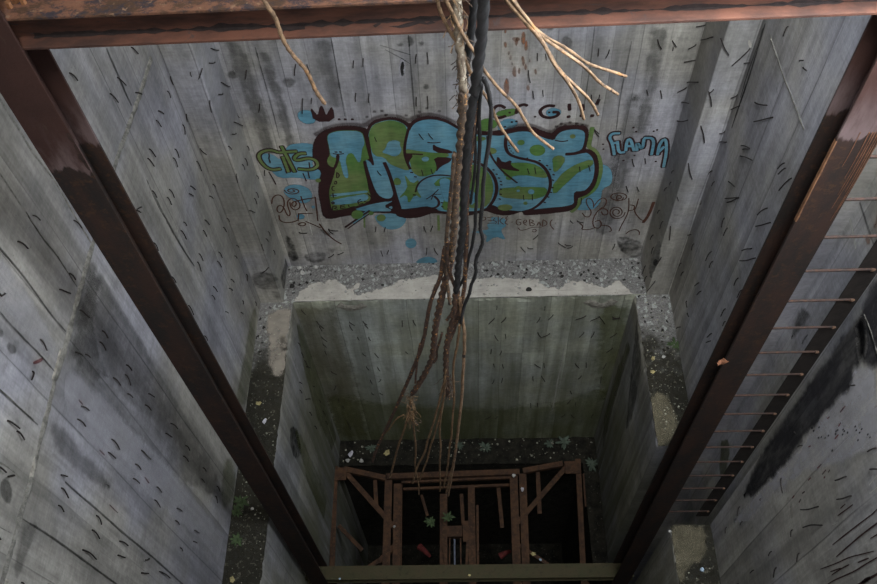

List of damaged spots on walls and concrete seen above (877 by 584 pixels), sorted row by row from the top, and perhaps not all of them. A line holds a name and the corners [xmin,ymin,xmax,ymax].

rust [34,16,468,39]
rust [488,0,877,18]
rust [504,30,537,95]
damp [744,281,877,497]